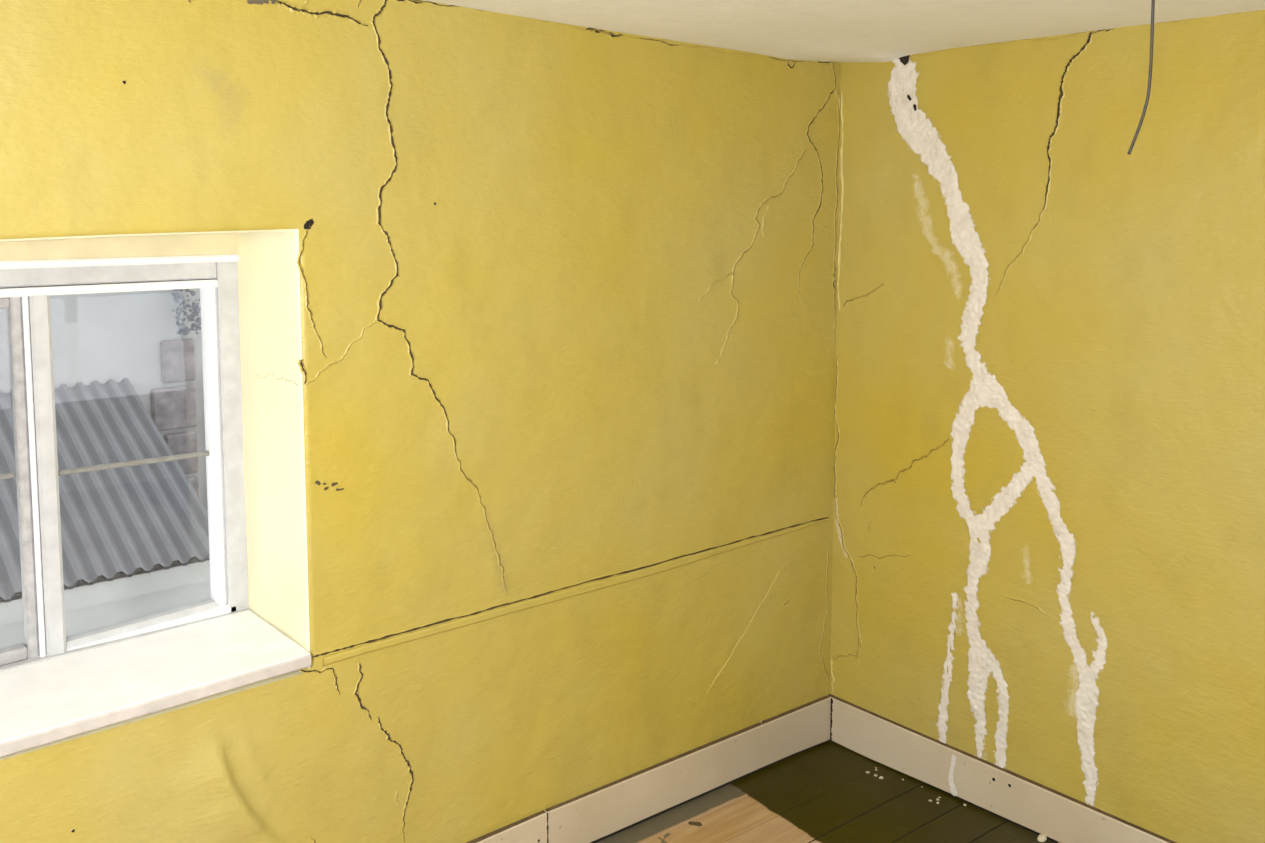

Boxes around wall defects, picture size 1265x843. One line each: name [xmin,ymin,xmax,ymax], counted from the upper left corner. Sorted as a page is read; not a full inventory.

crack [234,0,950,843]
crack [912,28,1115,297]